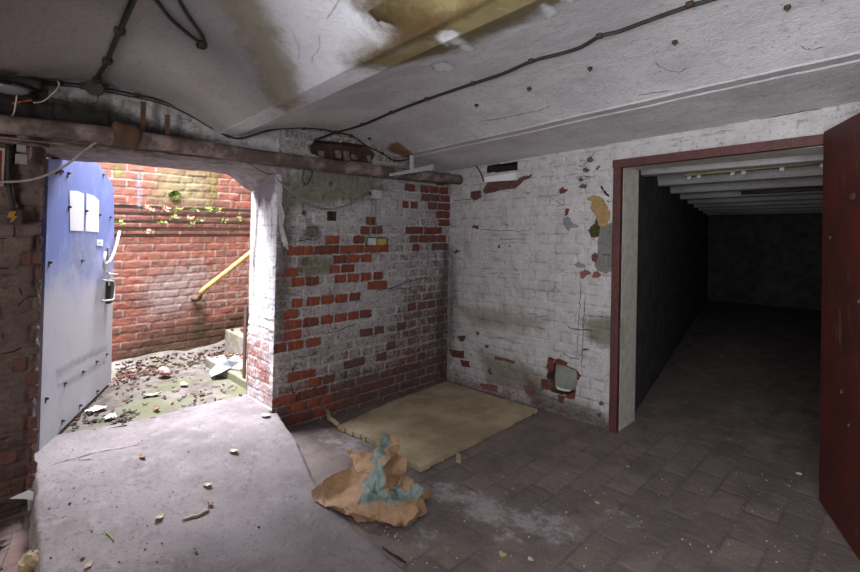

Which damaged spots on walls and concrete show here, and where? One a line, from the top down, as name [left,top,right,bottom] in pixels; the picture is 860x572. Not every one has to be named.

water stain [359,0,561,69]
spalling [309,140,375,164]
spalling [470,162,532,200]
flaking render [579,156,610,227]
peeling [402,183,460,254]
peeling [563,208,579,231]
peeling [273,174,443,362]
peeling [575,252,601,279]
peeling [449,331,479,368]
peeling [274,363,414,426]
spalling [523,357,581,404]
crack [382,546,407,565]